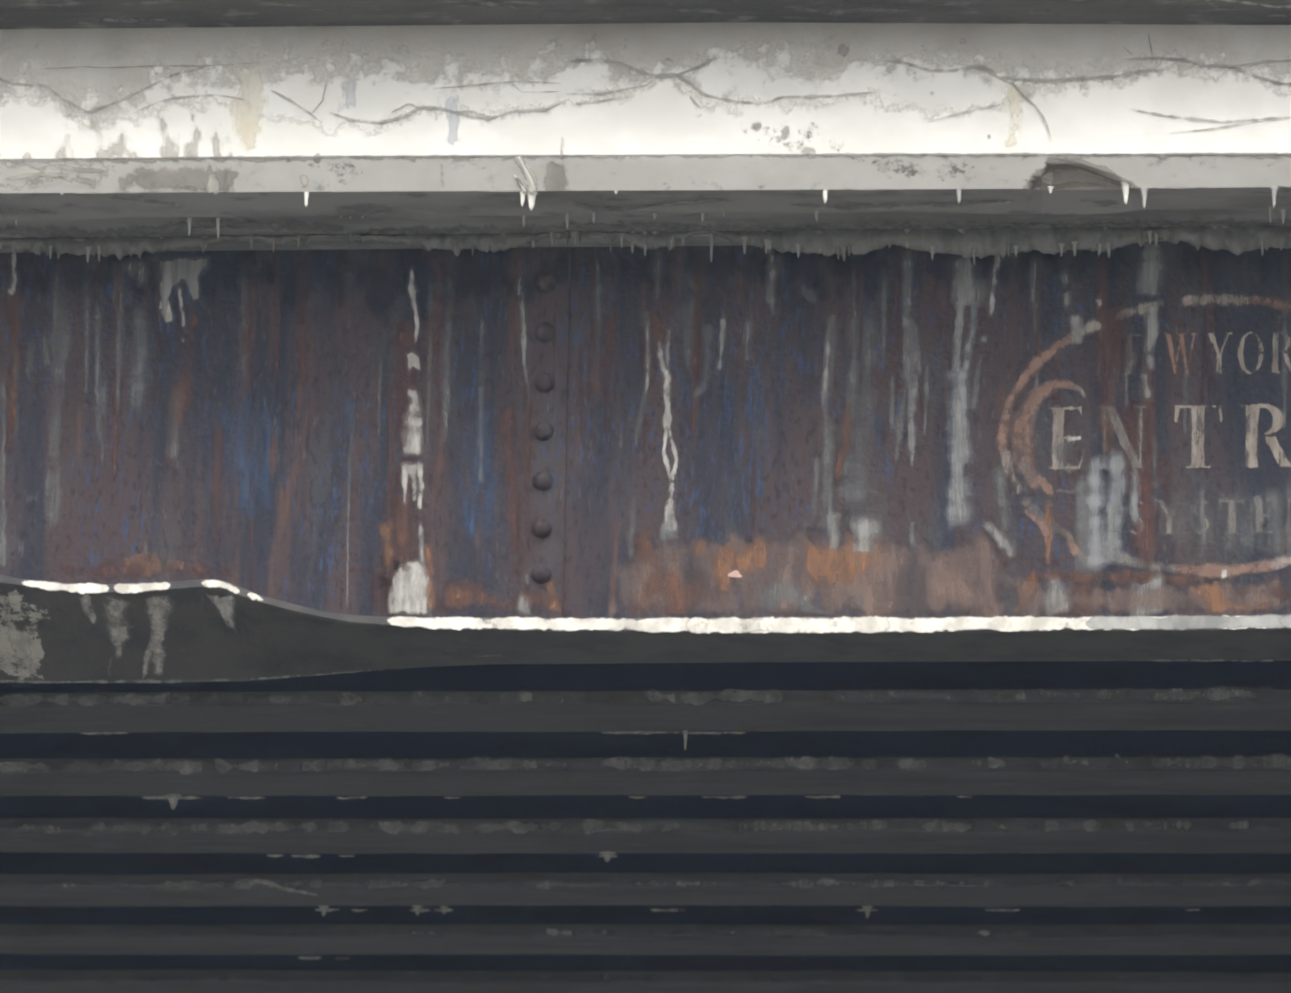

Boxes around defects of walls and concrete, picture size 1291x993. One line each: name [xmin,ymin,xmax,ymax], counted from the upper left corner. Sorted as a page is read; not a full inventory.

crack [64,63,248,113]
crack [64,153,582,161]
crack [273,81,560,124]
crack [574,59,872,107]
crack [822,40,1291,156]
damp [0,40,1291,567]
damp [22,580,170,594]
damp [201,476,263,601]
corrosion [378,322,435,614]
damp [387,525,1291,634]
corrosion [615,504,1101,617]
corrosion [1100,403,1288,617]